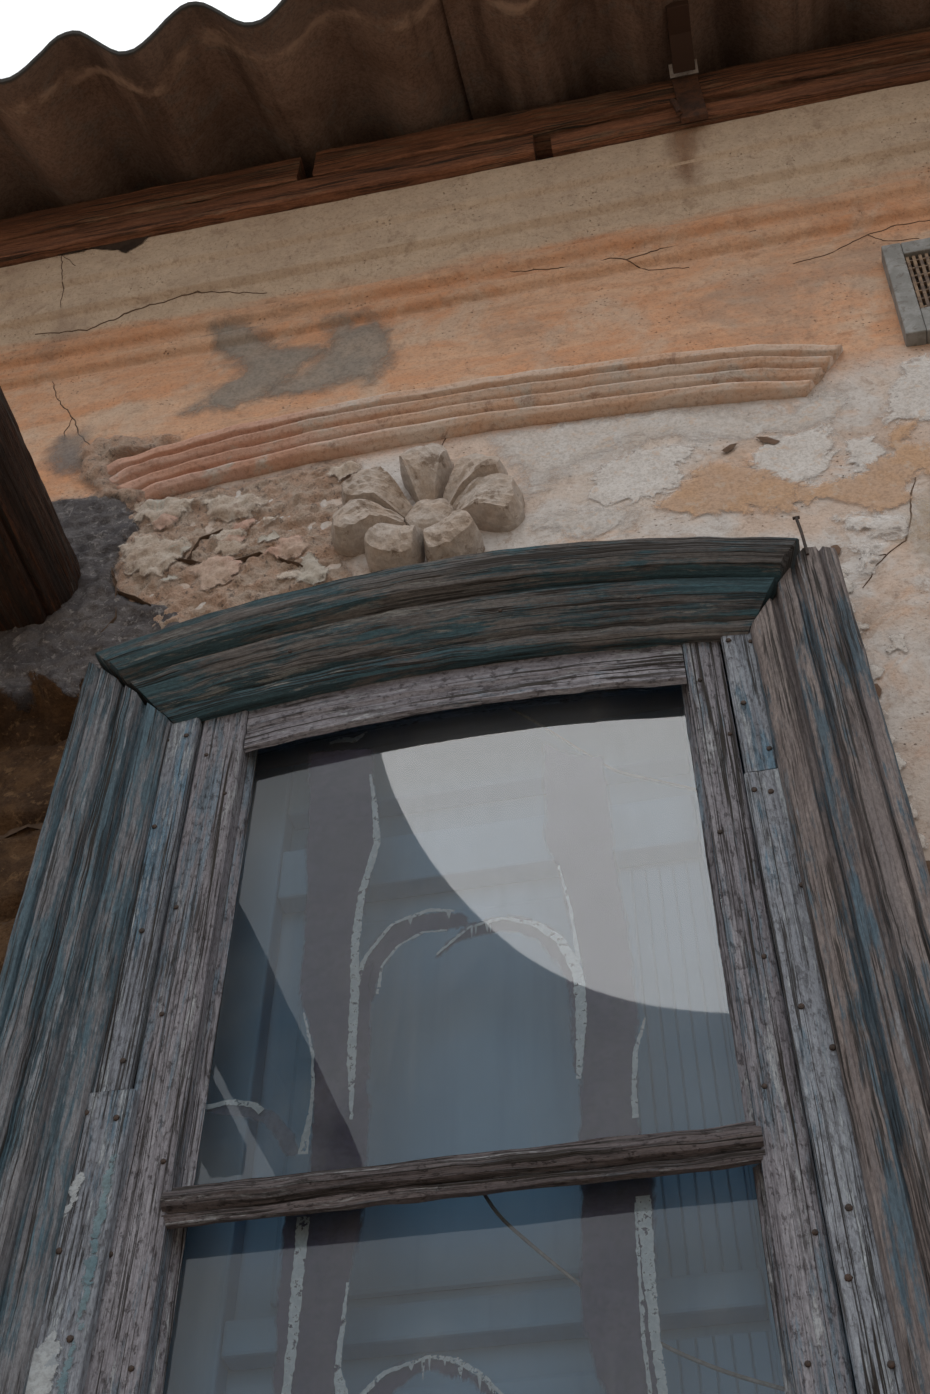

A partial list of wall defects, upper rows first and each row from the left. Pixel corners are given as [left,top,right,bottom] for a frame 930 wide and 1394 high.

crack [35,255,267,335]
crack [510,265,569,273]
crack [601,246,689,271]
crack [793,220,930,264]
peeling [491,353,930,516]
spalling [79,434,363,629]
peeling [831,511,908,575]
crack [859,477,916,588]